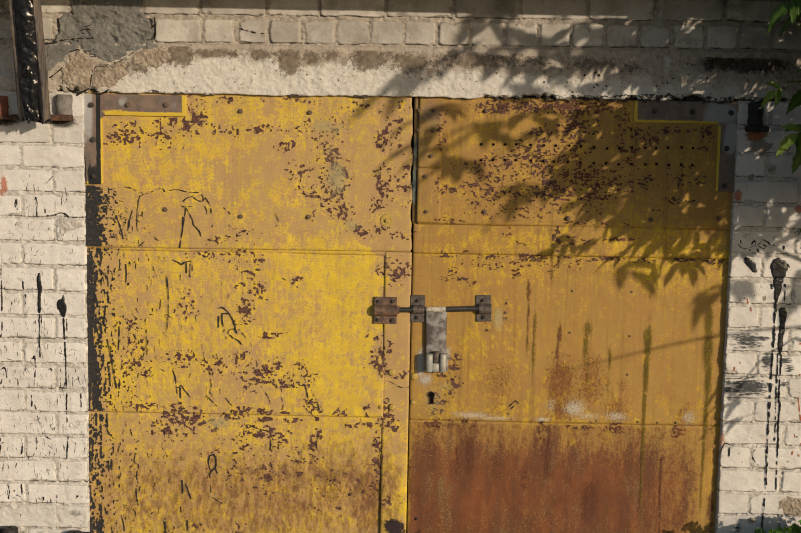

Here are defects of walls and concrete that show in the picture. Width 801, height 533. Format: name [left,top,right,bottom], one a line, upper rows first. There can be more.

spalling [60,50,95,90]
water stain [89,52,156,84]
water stain [166,43,238,68]
water stain [251,29,552,79]
water stain [565,57,646,75]
peeling [103,92,418,240]
spalling [435,70,791,286]
peeling [185,229,273,325]
peeling [375,257,419,290]
peeling [113,316,410,517]
corrosion [541,350,631,483]